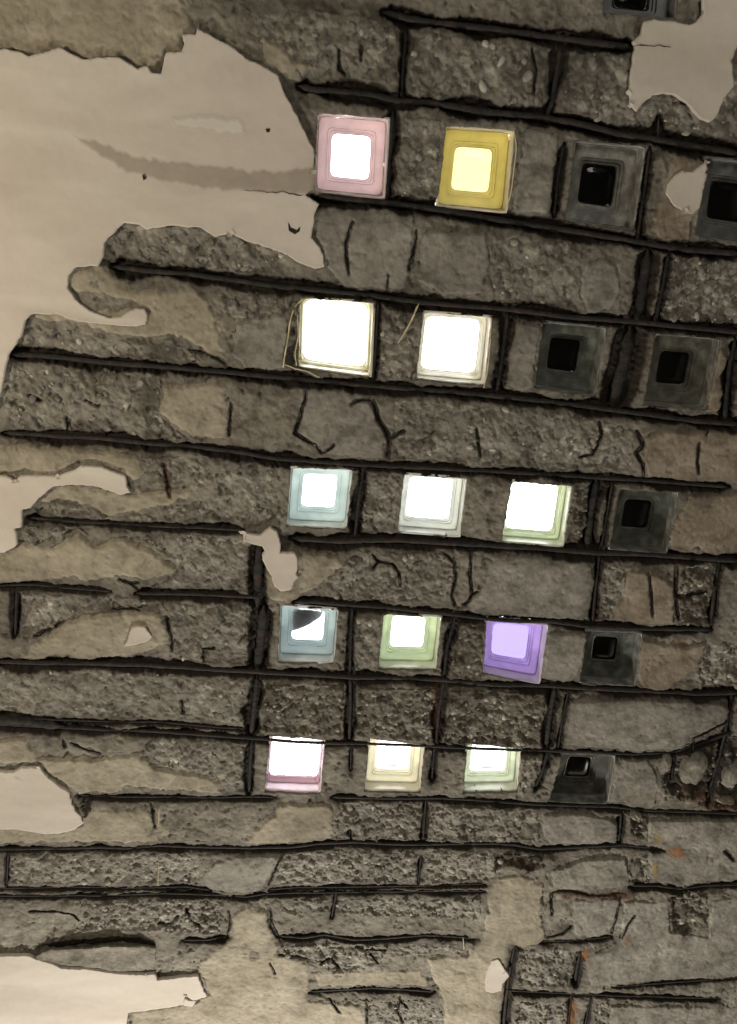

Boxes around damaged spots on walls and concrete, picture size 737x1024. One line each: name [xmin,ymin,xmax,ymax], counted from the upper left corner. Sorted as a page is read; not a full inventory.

peeling [556,0,737,146]
water stain [87,142,319,192]
peeling [0,28,324,440]
crack [293,390,335,454]
crack [353,398,403,464]
spalling [393,400,636,472]
crack [636,431,645,478]
spalling [0,454,298,724]
crack [373,555,401,581]
crack [444,546,477,606]
spalling [274,802,544,921]
peeling [0,953,207,1024]